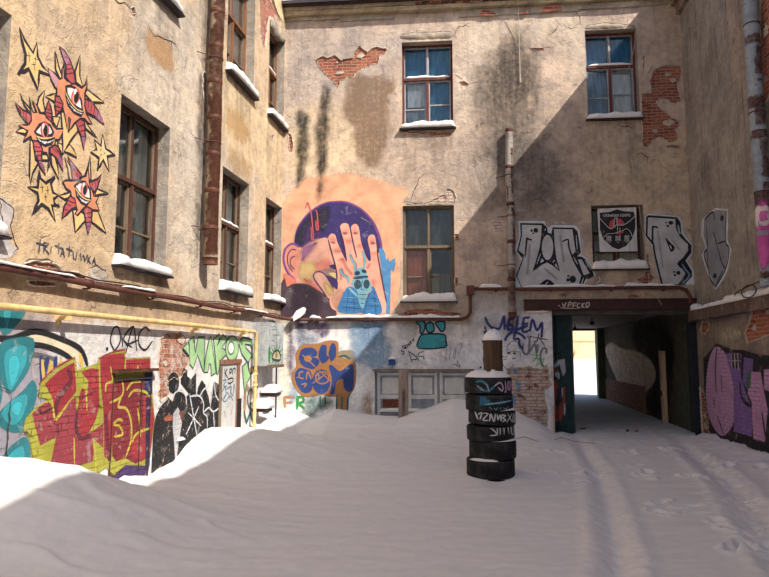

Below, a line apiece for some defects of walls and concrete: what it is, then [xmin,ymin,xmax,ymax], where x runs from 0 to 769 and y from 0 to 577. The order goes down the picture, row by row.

rust [204,0,248,255]
spalling [259,0,282,47]
water stain [297,89,330,182]
spalling [315,45,388,87]
water stain [345,75,394,165]
water stain [479,38,533,155]
rust [506,131,515,255]
spalling [640,65,683,149]
rust [744,33,763,81]
rust [748,94,769,208]
spalling [157,330,190,403]
spalling [507,366,551,427]